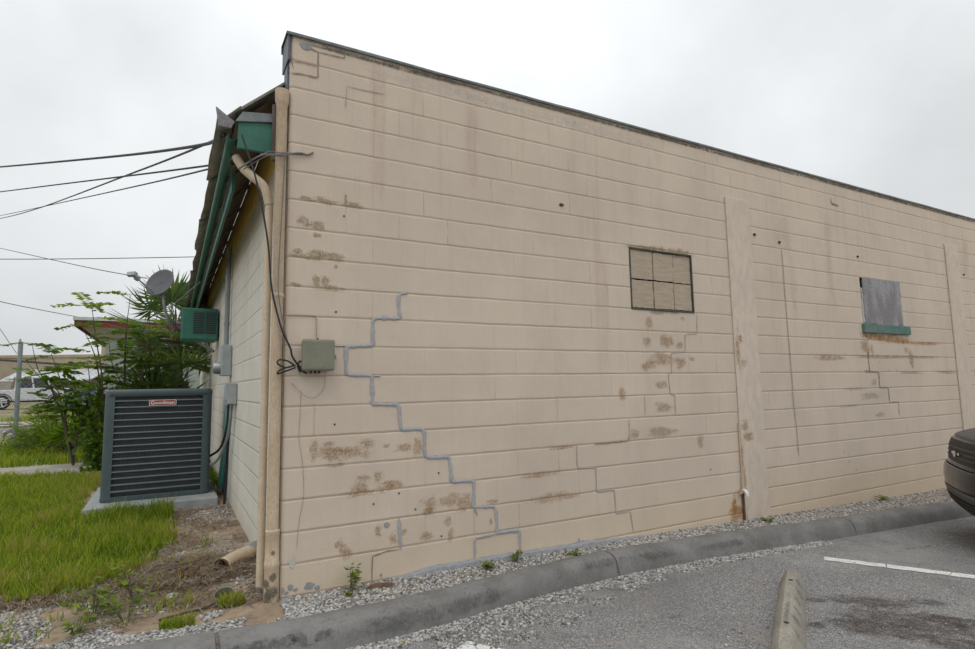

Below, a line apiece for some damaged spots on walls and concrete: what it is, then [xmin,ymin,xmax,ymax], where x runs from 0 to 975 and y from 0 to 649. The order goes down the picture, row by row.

crack [372,518,402,570]
crack [335,292,521,559]